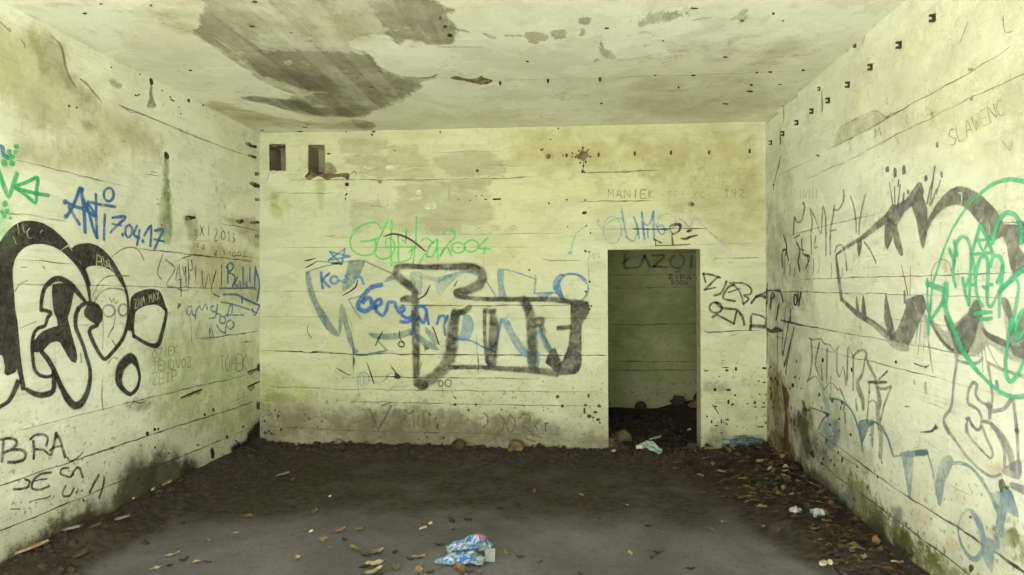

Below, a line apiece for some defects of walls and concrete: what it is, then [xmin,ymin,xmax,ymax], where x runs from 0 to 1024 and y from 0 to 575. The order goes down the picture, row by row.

rust [767,367,818,458]
water stain [35,428,198,543]
water stain [768,431,966,575]
water stain [993,527,1024,559]